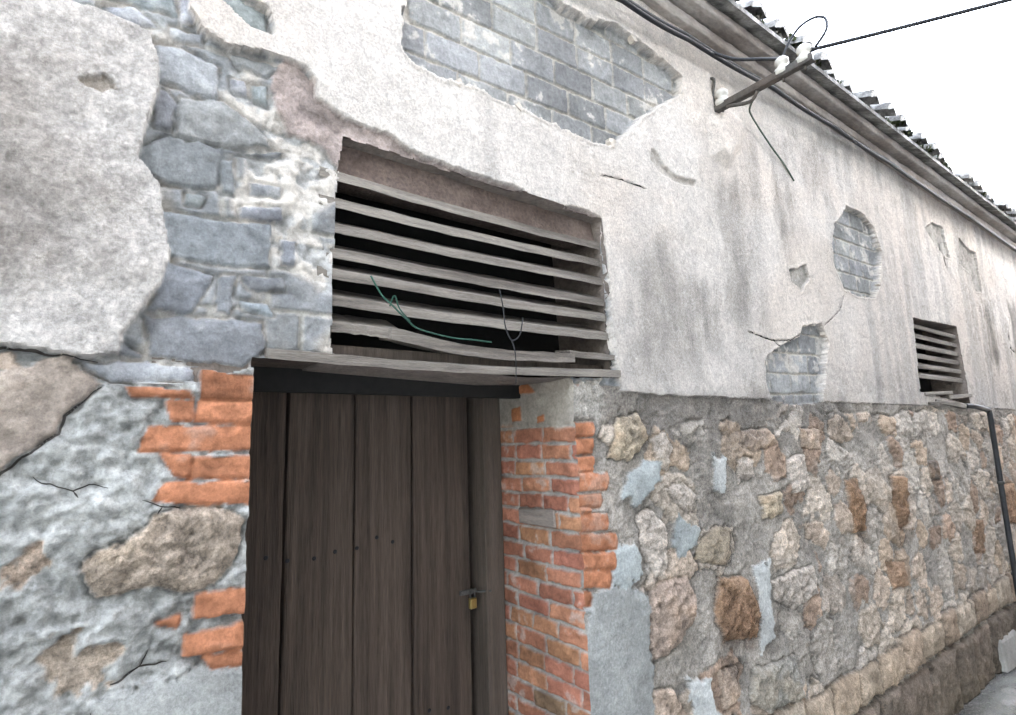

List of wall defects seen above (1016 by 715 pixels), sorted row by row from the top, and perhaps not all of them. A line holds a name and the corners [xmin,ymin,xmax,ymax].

flaking render [396,0,685,150]
peeling [72,0,490,386]
flaking render [831,203,883,301]
peeling [0,342,59,363]
crack [0,346,98,363]
peeling [571,236,622,387]
flaking render [763,319,830,405]
crack [0,387,107,498]
crack [110,650,166,685]